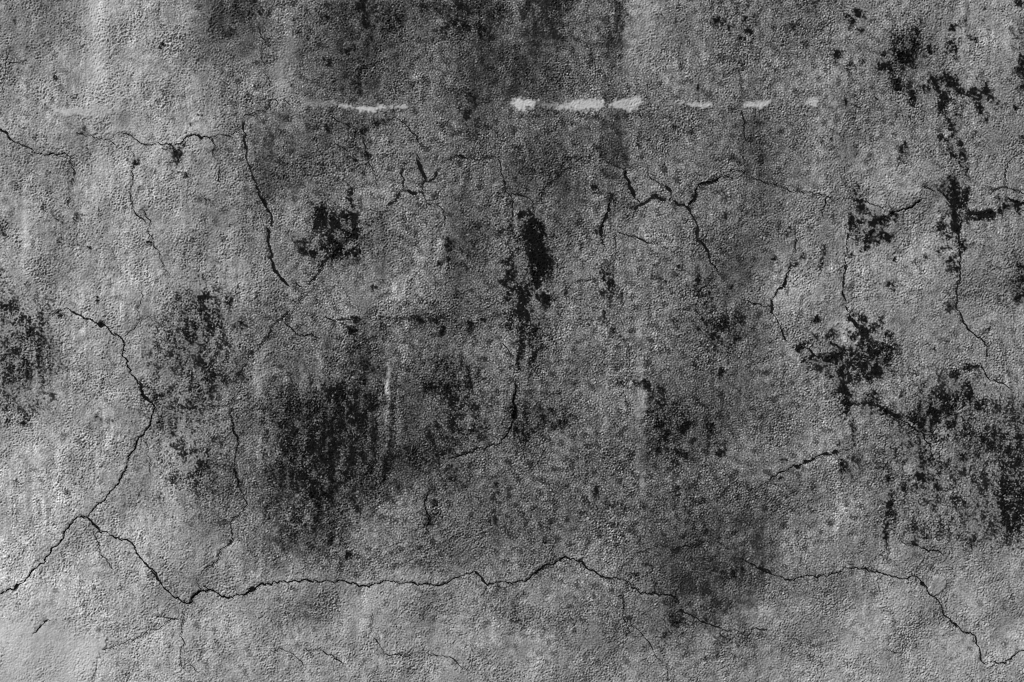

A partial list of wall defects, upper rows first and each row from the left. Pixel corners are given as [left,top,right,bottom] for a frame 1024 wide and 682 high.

leakage [140,258,261,503]
leakage [292,183,365,269]
leakage [255,312,498,553]
crack [0,22,768,682]
leakage [437,208,562,379]
crack [548,62,1024,478]
crack [747,448,851,491]
leakage [836,2,867,33]
leakage [792,308,1024,552]
leakage [825,17,1021,276]
leakage [1009,0,1024,89]
crack [626,518,1024,664]